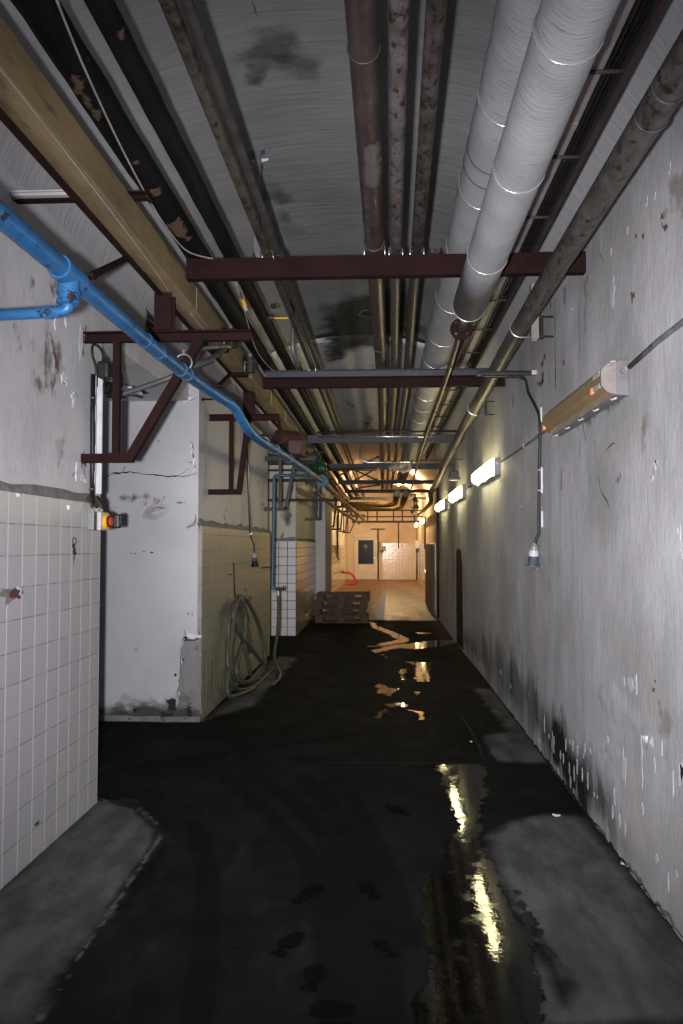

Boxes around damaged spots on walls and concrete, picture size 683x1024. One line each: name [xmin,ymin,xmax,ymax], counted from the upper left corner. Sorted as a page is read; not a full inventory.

crack [102,467,196,480]
spalling [176,630,202,717]
damp [99,692,203,722]